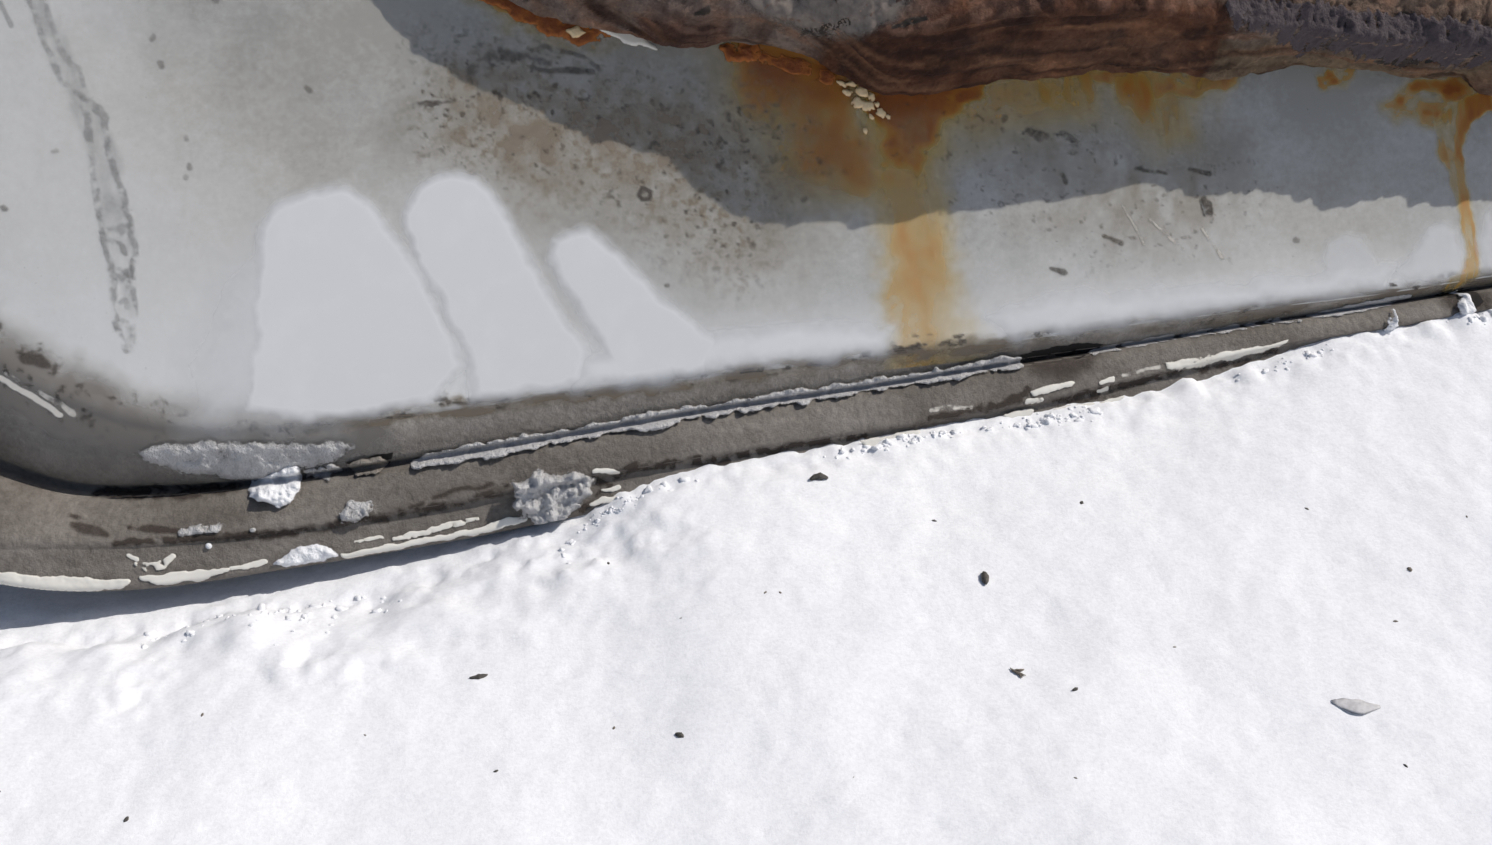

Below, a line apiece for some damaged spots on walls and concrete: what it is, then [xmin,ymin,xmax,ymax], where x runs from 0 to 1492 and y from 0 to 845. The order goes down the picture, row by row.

corrosion [481,0,611,48]
corrosion [1317,68,1355,90]
corrosion [719,42,1238,364]
corrosion [1386,77,1492,289]
peeling [1004,339,1289,418]
peeling [860,430,920,446]
peeling [590,468,621,506]
peeling [340,517,528,559]
peeling [0,553,268,592]